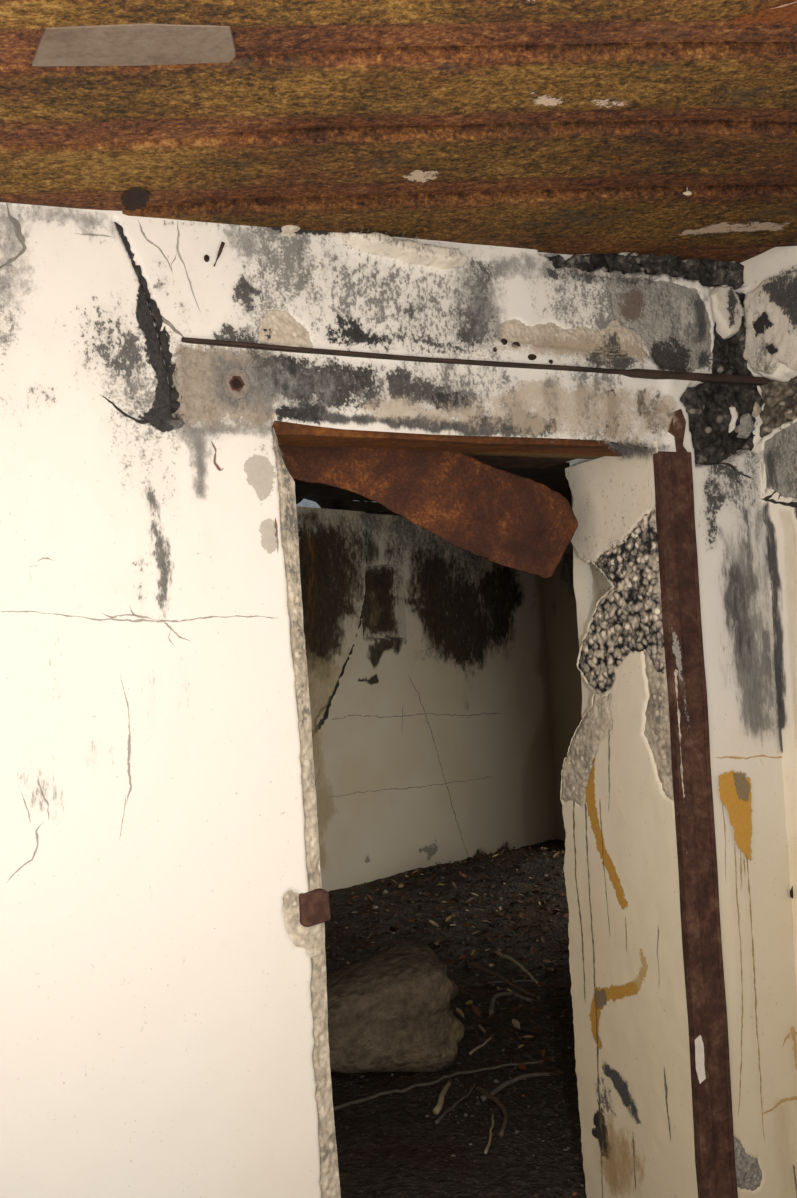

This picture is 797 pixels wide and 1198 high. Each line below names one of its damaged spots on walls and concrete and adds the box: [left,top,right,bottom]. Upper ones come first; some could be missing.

crack [2,608,275,643]
water stain [358,566,403,684]
water stain [76,223,713,495]
crack [312,530,499,857]
corrosion [278,445,578,578]
spalling [561,505,689,806]
spalling [493,254,797,499]
water stain [698,426,797,752]
crack [702,462,797,508]